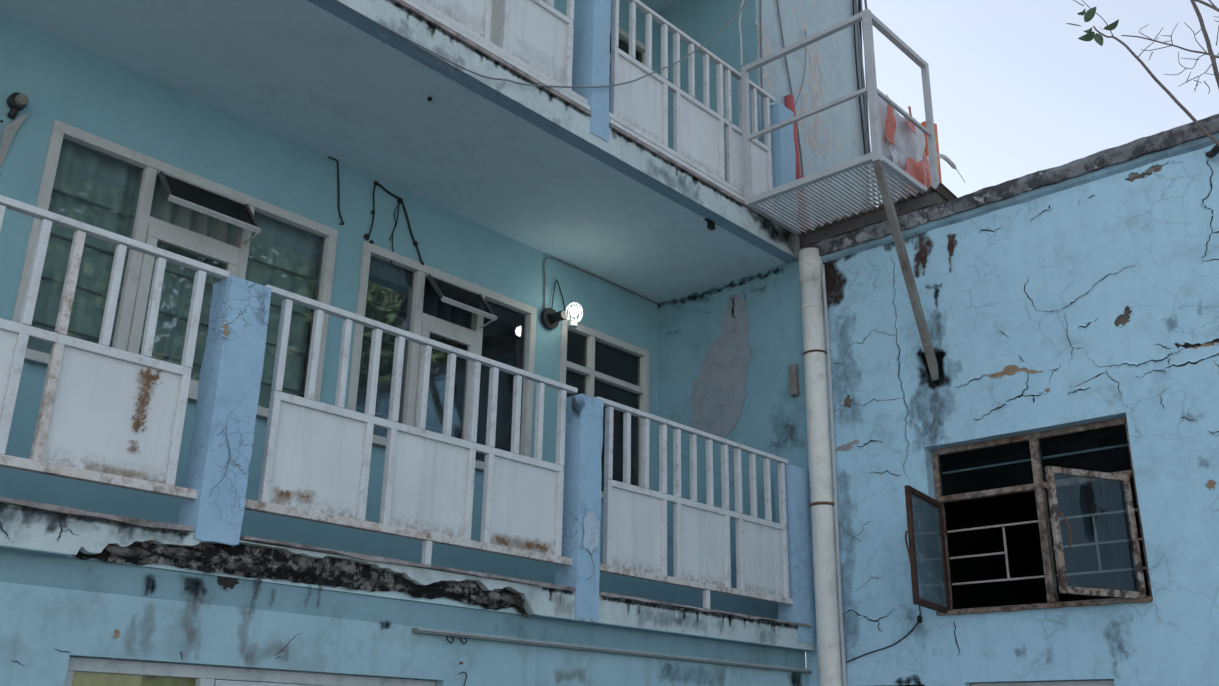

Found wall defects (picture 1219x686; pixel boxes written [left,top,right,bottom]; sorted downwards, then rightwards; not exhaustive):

leakage [612,130,795,254]
crack [1200,150,1219,261]
rust [914,234,957,277]
rust [129,367,162,451]
crack [826,260,911,478]
leakage [917,348,950,389]
peeling [988,364,1044,379]
crack [973,266,1219,436]
spalling [1114,305,1134,328]
leakage [185,577,207,599]
spalling [74,540,528,618]
leakage [602,596,798,629]